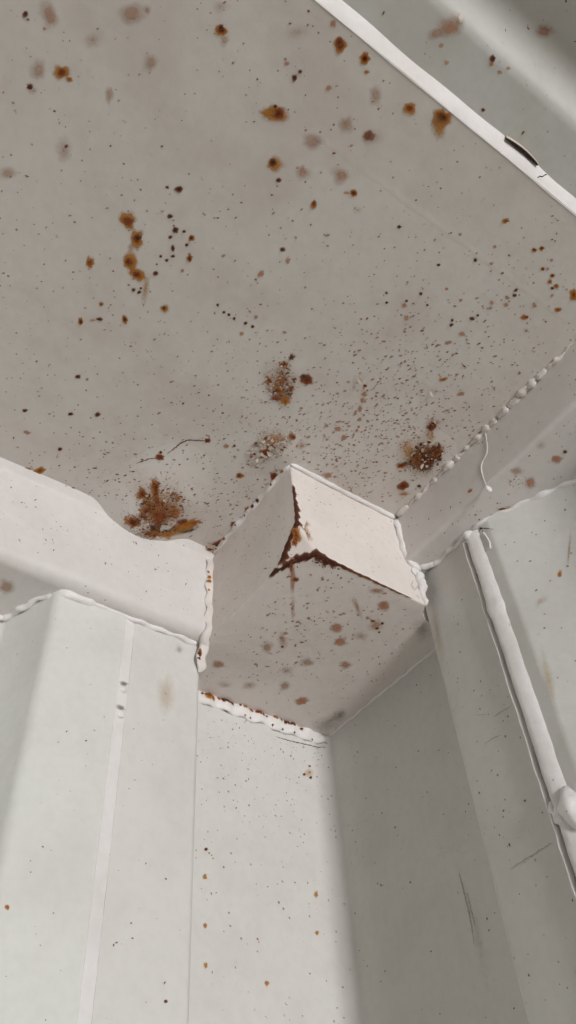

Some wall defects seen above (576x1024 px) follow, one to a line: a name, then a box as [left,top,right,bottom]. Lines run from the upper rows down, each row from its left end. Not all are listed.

rust [253,105,289,122]
rust [433,109,451,135]
rust [86,186,169,368]
crack [138,435,211,463]
rust [56,274,555,553]
rust [206,476,411,704]
rust [201,692,322,847]